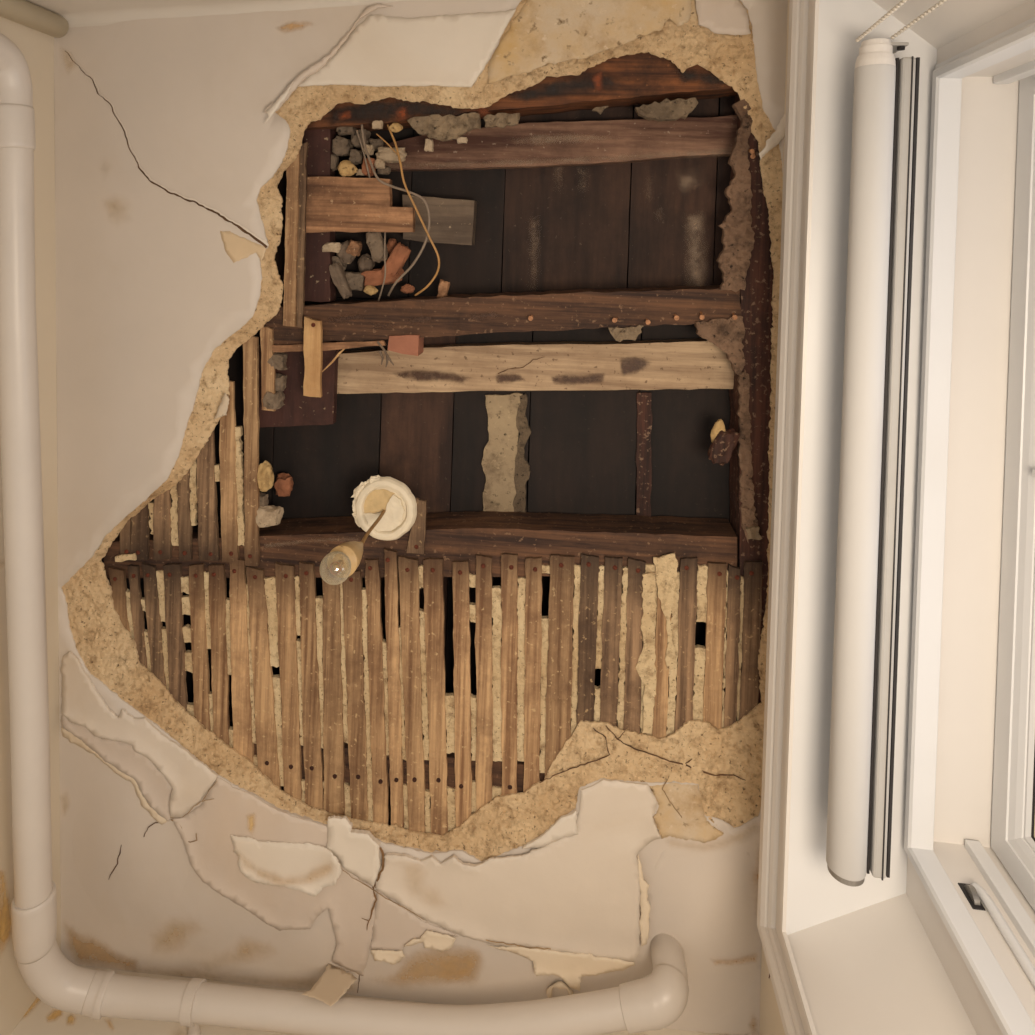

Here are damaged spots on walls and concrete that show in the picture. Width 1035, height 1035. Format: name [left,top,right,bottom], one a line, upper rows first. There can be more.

crack [65,51,269,248]
flaking render [60,0,786,1006]
crack [144,781,217,843]
crack [539,726,745,818]
crack [342,847,424,928]
crack [486,940,551,950]